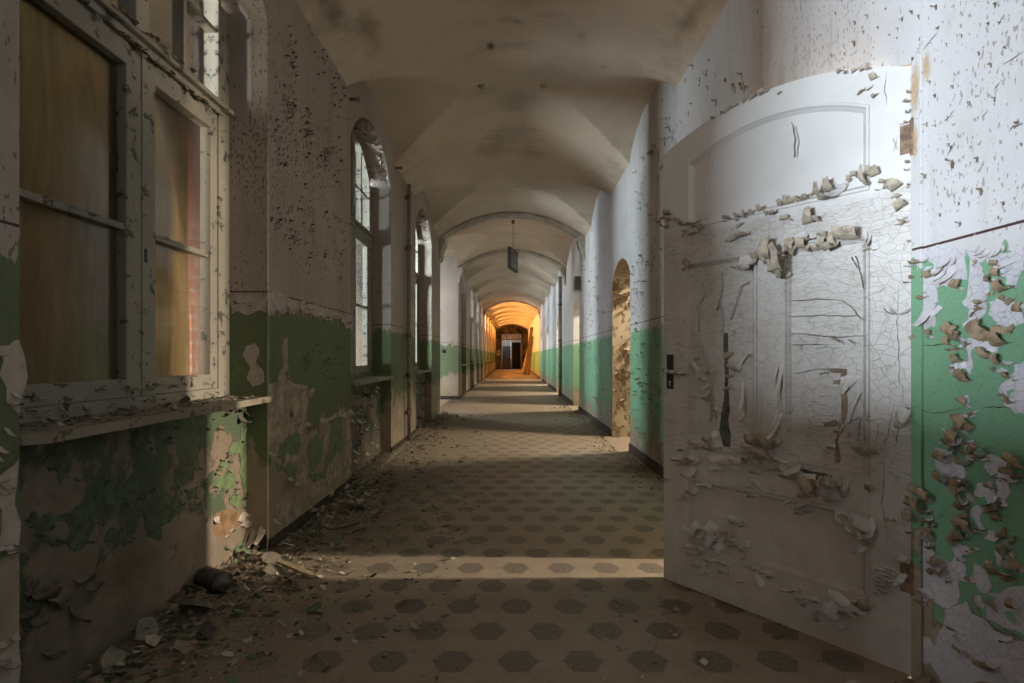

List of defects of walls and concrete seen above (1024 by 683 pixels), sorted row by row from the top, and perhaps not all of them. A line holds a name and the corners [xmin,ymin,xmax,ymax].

peeling [269,24,388,285]
peeling [721,159,927,279]
peeling [0,428,21,555]
peeling [0,339,93,419]
flaking render [174,338,381,555]
peeling [231,290,352,331]
peeling [578,231,664,457]
crack [697,272,751,423]
crack [787,256,865,374]
peeling [674,244,1024,683]
crack [840,284,1011,557]
peeling [0,632,22,683]